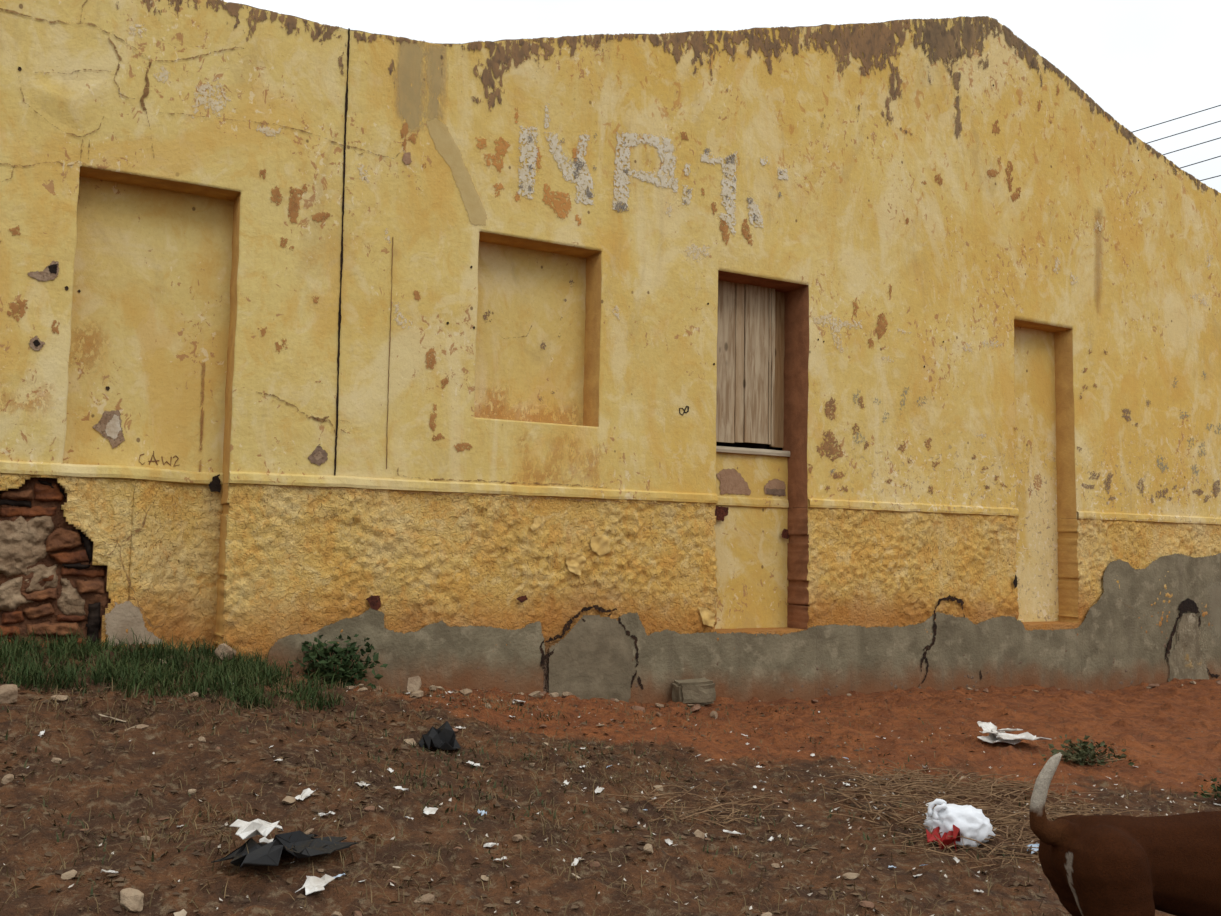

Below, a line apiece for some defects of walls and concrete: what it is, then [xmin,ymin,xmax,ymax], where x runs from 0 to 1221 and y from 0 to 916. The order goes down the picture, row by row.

crack [0,0,244,180]
water stain [388,41,445,130]
peeling [450,19,918,135]
spalling [28,261,59,281]
crack [255,28,710,507]
peeling [808,397,869,492]
spalling [715,469,786,521]
flaking render [0,478,162,652]
crack [540,605,644,690]
peeling [618,553,1221,704]
crack [919,595,965,687]
crack [1165,610,1201,662]